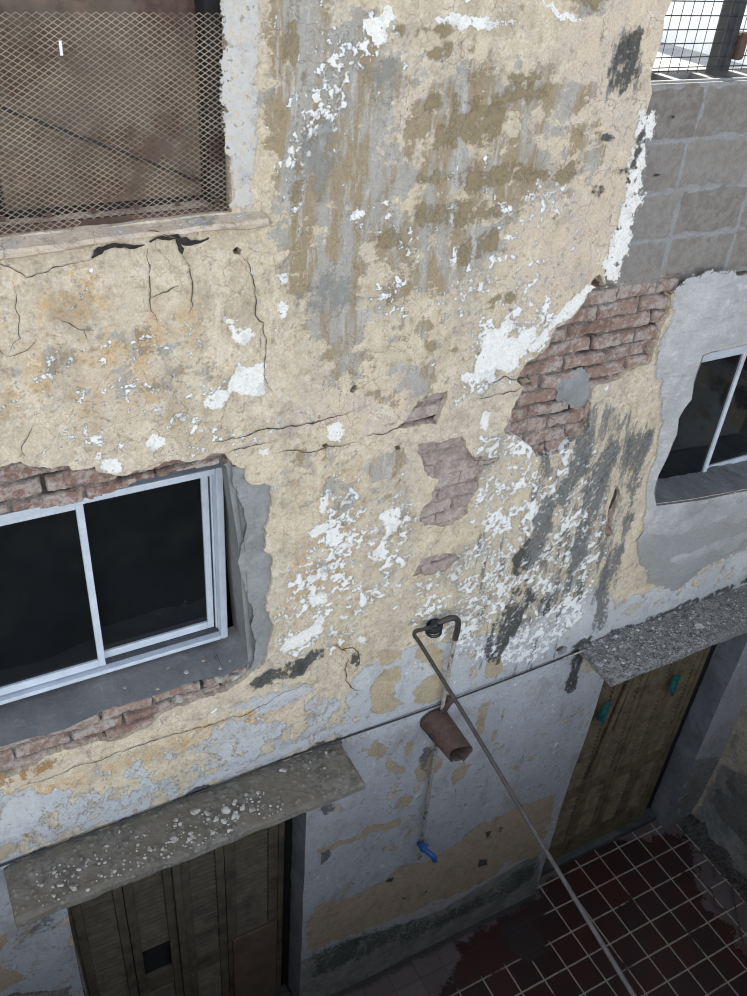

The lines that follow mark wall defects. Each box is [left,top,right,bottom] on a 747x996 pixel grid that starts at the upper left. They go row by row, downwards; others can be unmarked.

peeling [362,4,398,48]
peeling [434,11,520,32]
crack [0,230,209,357]
crack [238,252,272,391]
flaking render [460,108,680,453]
flaking render [0,443,239,514]
crack [215,411,407,454]
flaking render [417,437,498,525]
damp [484,430,653,665]
damp [565,544,747,693]
flaking render [0,651,247,772]
damp [420,747,432,777]